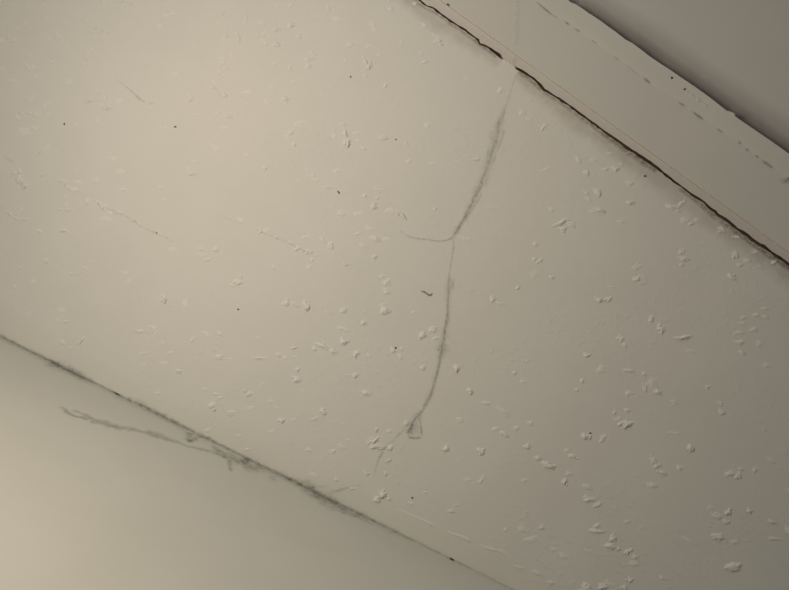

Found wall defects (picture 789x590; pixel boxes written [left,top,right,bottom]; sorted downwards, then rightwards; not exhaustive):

crack [419,0,501,58]
crack [517,68,789,266]